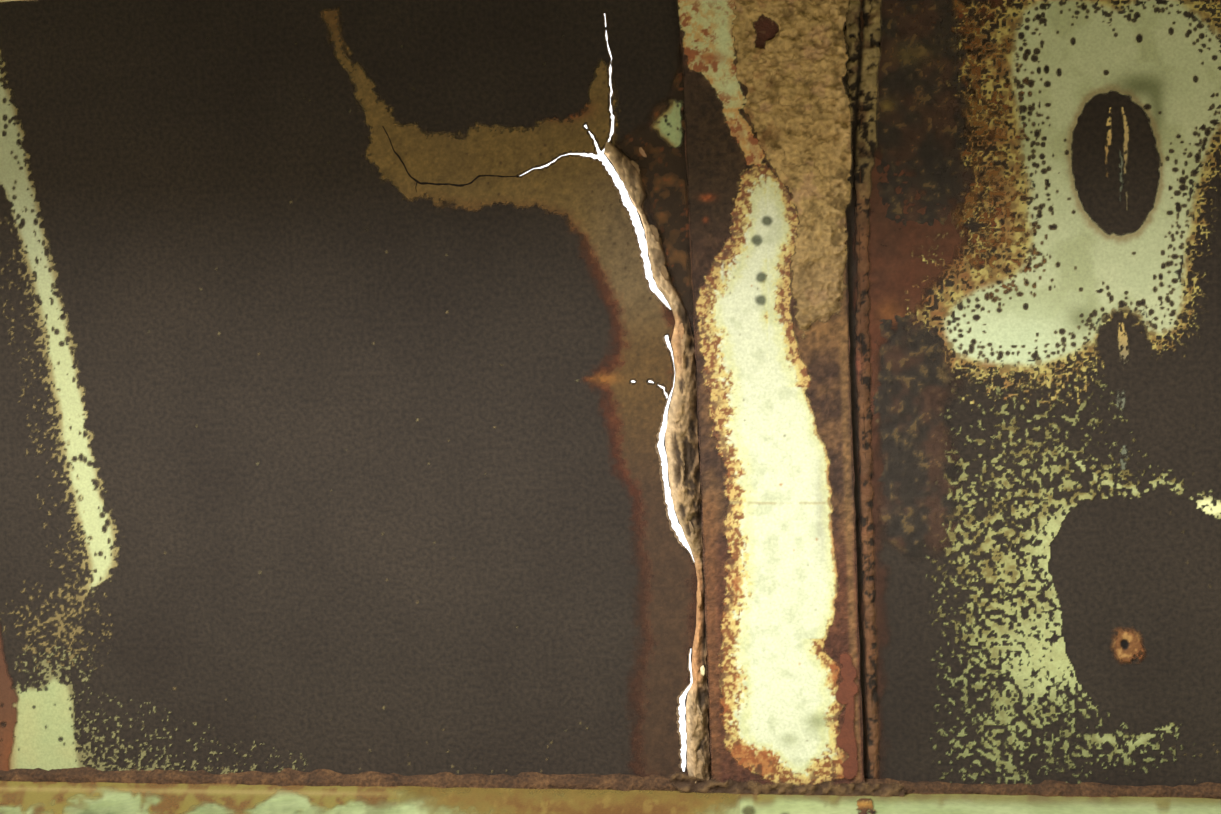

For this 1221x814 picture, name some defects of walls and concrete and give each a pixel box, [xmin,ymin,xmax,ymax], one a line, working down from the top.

peeling [652,101,682,148]
damp [1119,107,1129,209]
crack [382,13,694,563]
corrosion [0,8,799,814]
corrosion [789,0,1046,814]
peeling [905,0,1221,785]
corrosion [1113,629,1145,663]
crack [676,649,691,772]
corrosion [892,793,1221,805]